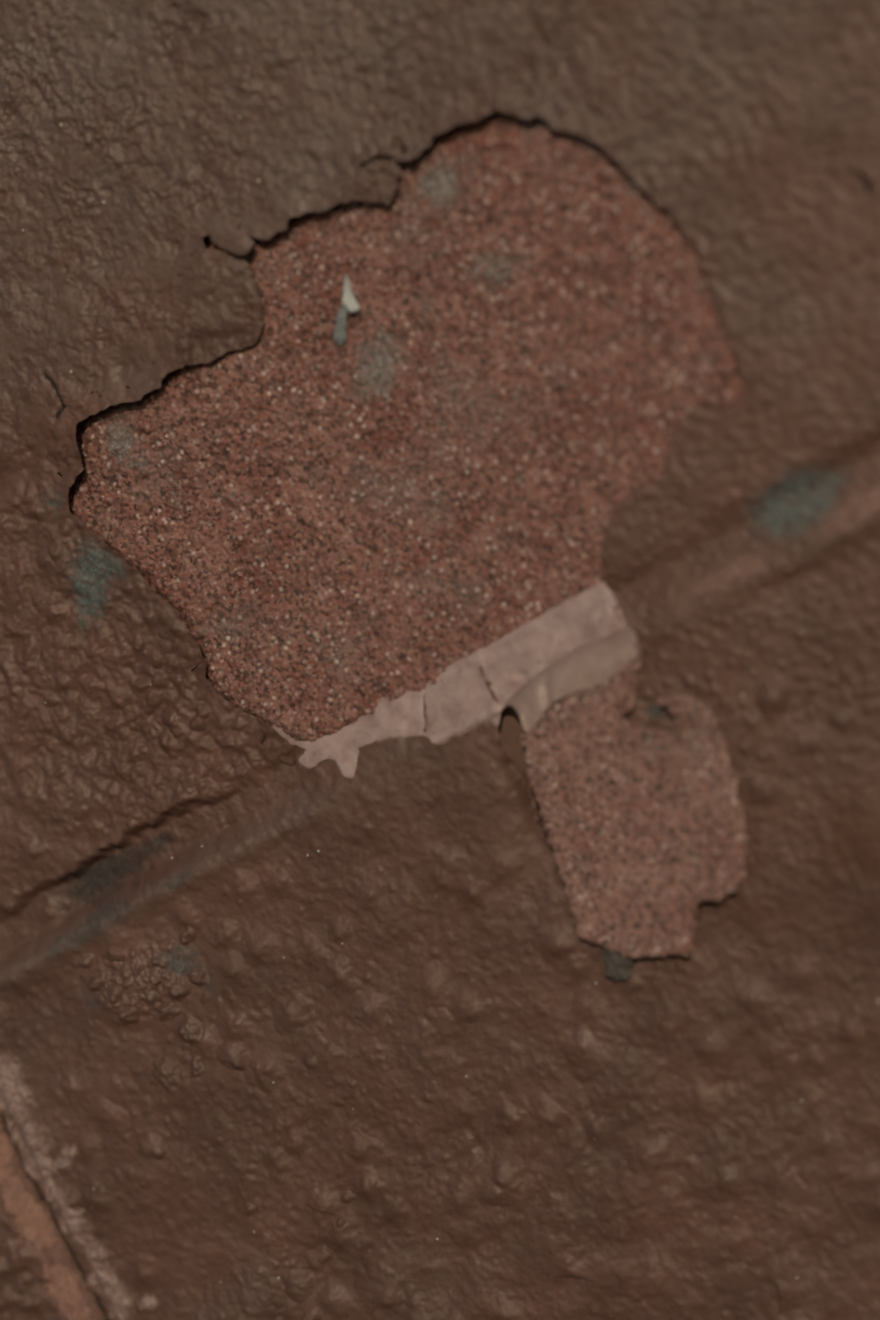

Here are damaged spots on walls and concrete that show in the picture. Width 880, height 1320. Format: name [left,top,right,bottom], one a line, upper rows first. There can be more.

peeling [68,110,743,778]